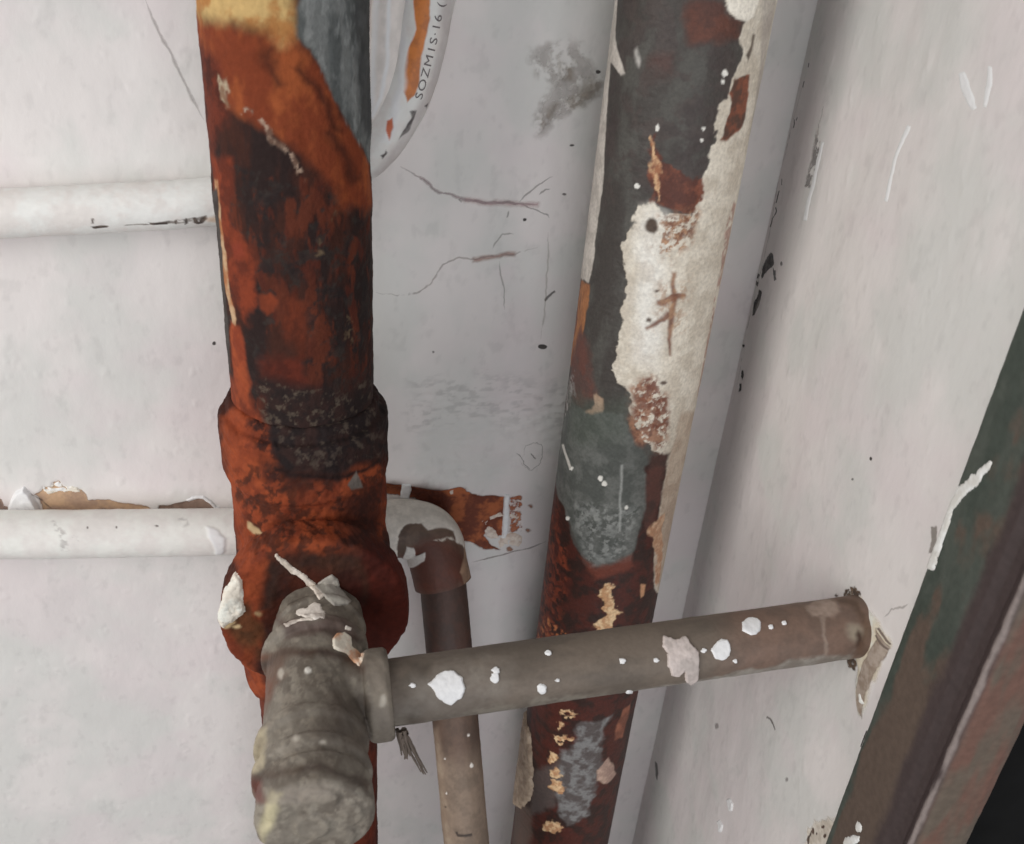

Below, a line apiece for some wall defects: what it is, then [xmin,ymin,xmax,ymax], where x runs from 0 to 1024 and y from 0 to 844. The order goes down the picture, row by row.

crack [474,253,514,261]
peeling [35,481,220,510]
peeling [386,483,532,551]
peeling [929,527,937,553]
peeling [856,631,890,717]